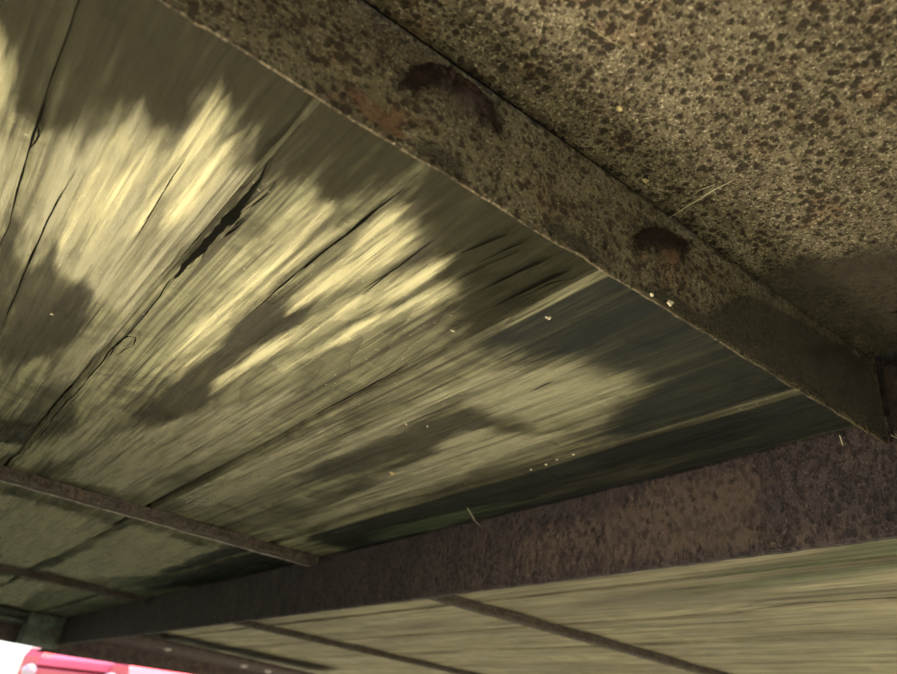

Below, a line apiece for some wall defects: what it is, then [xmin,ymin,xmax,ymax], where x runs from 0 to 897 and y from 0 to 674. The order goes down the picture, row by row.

crack [0,0,80,245]
crack [2,172,75,327]